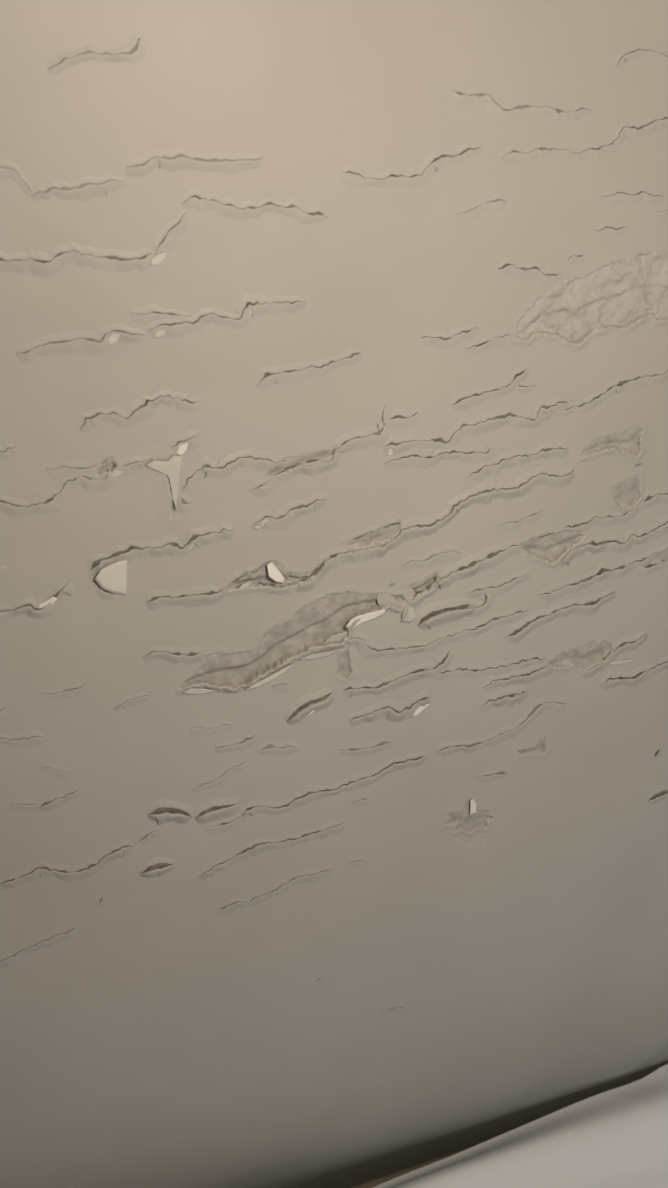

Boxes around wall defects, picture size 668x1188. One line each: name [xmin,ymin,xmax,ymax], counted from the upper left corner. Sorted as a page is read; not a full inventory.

crack [46,34,147,74]
crack [614,44,668,68]
crack [341,85,668,189]
crack [0,146,328,278]
crack [498,185,665,287]
crack [14,293,306,364]
peeling [513,521,596,573]
peeling [168,548,415,700]
crack [0,323,668,915]